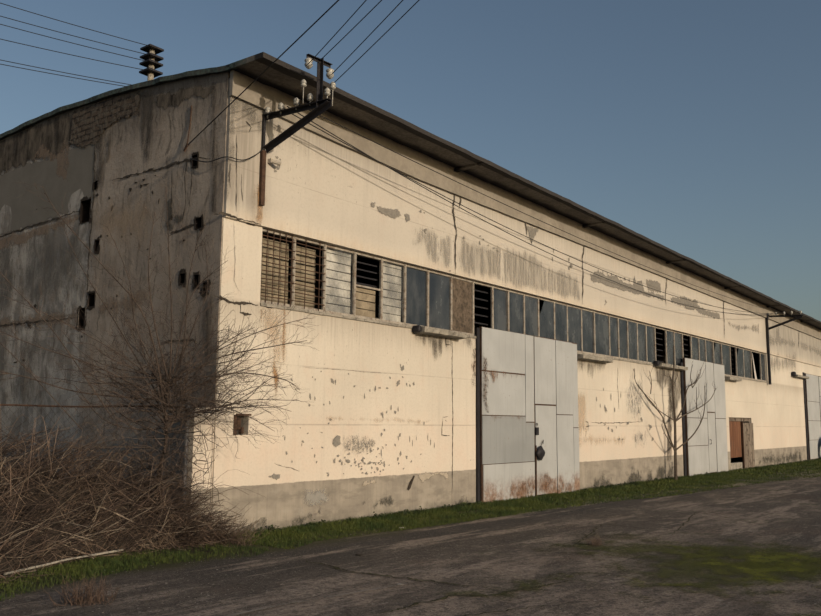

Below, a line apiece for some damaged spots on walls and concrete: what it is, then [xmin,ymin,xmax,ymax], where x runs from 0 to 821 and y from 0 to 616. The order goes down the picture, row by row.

spalling [0,111,74,174]
spalling [79,181,113,224]
crack [0,121,261,329]
peeling [371,203,410,221]
crack [452,194,461,279]
peeling [591,269,720,319]
peeling [627,385,654,442]
water stain [628,368,681,483]
peeling [333,429,417,486]
peeling [407,472,448,490]